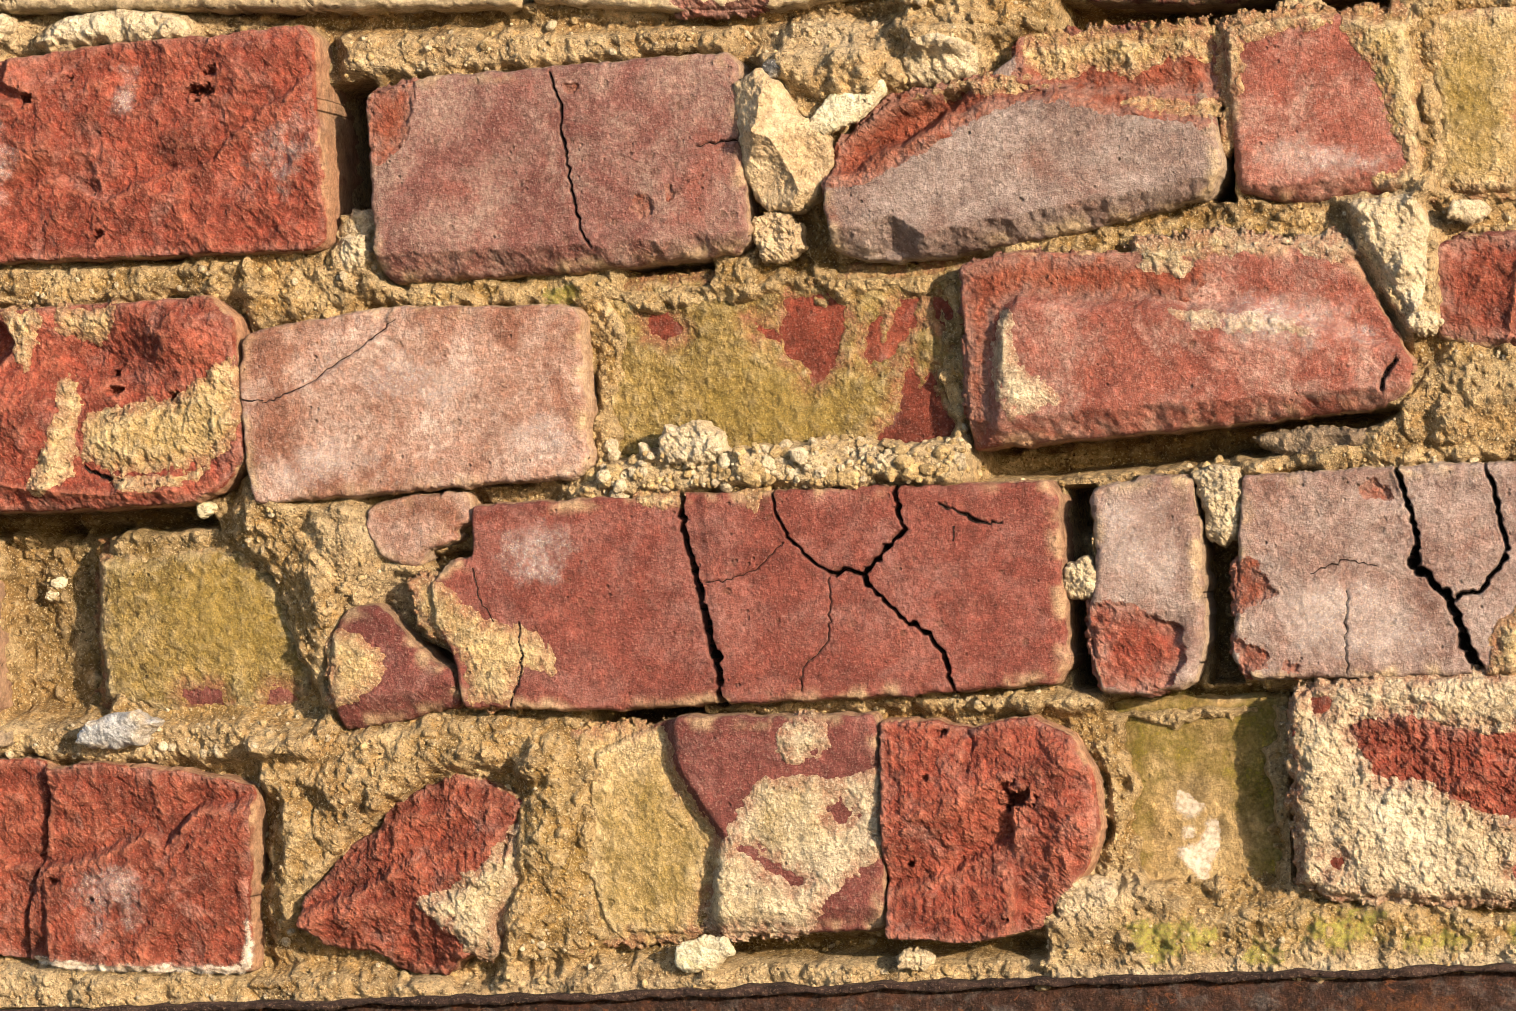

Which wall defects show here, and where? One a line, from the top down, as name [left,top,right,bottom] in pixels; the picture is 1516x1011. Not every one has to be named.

crack [550,73,592,247]
spalling [809,0,1516,207]
spalling [1438,231,1516,344]
crack [680,485,960,706]
crack [938,503,1002,541]
crack [1310,463,1510,673]
spalling [296,773,522,976]
spalling [570,709,1097,974]